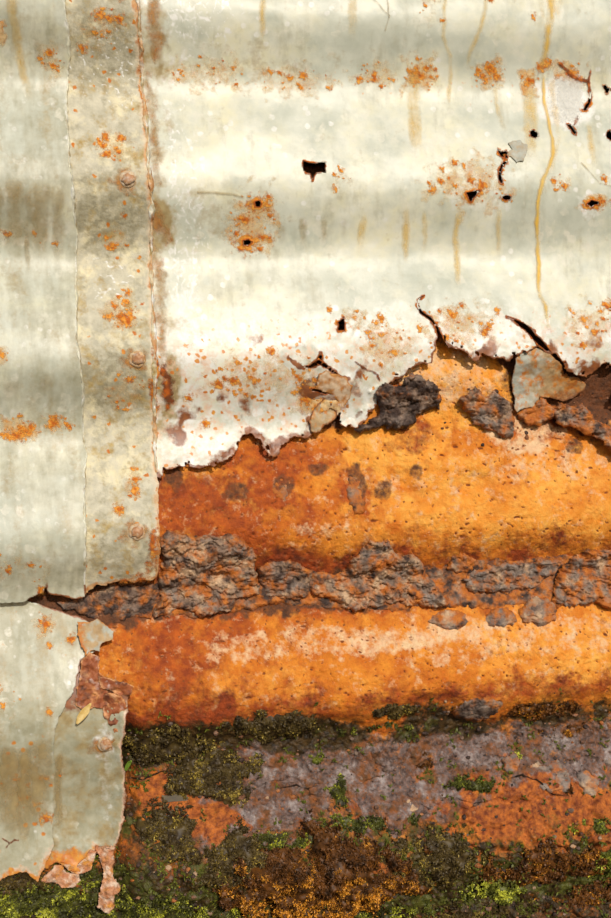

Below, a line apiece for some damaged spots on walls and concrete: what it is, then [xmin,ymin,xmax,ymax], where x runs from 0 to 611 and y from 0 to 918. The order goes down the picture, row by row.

leakage [544,0,554,57]
leakage [528,78,555,290]
corrosion [0,413,75,442]
corrosion [117,315,193,412]
corrosion [214,348,275,398]
peeling [309,370,353,433]
corrosion [354,372,442,434]
corrosion [459,386,611,451]
peeling [511,347,586,412]
corrosion [52,527,611,630]
peeling [77,619,115,656]
corrosion [75,652,134,752]